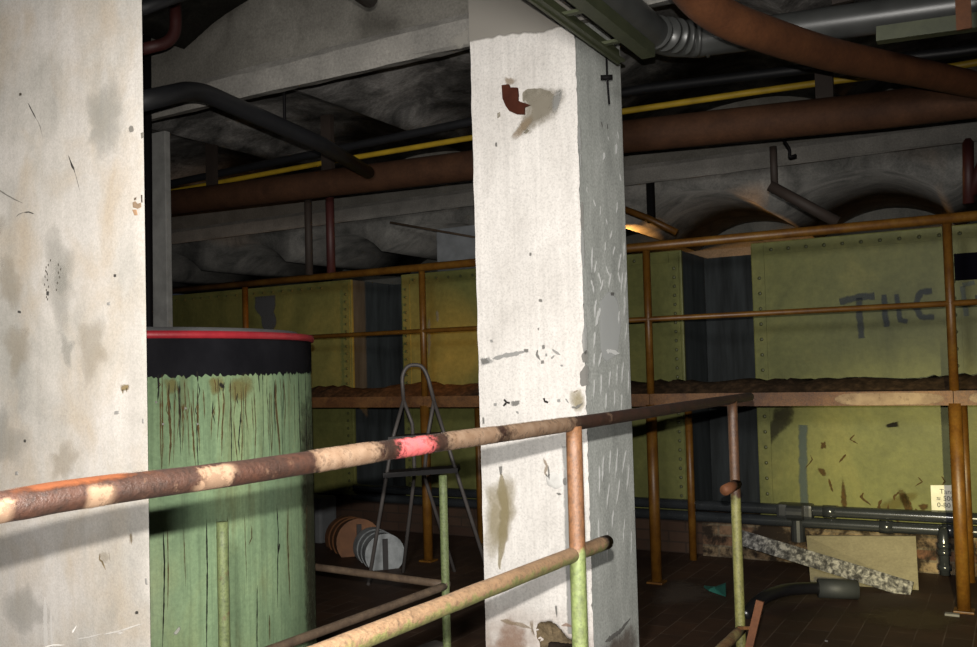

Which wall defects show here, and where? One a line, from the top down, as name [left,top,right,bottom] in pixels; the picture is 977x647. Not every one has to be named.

spalling [515,88,561,135]
corrosion [157,379,256,469]
corrosion [268,379,313,453]
corrosion [301,473,316,645]
damp [490,467,512,569]
peeling [543,446,569,549]
spalling [531,565,572,647]